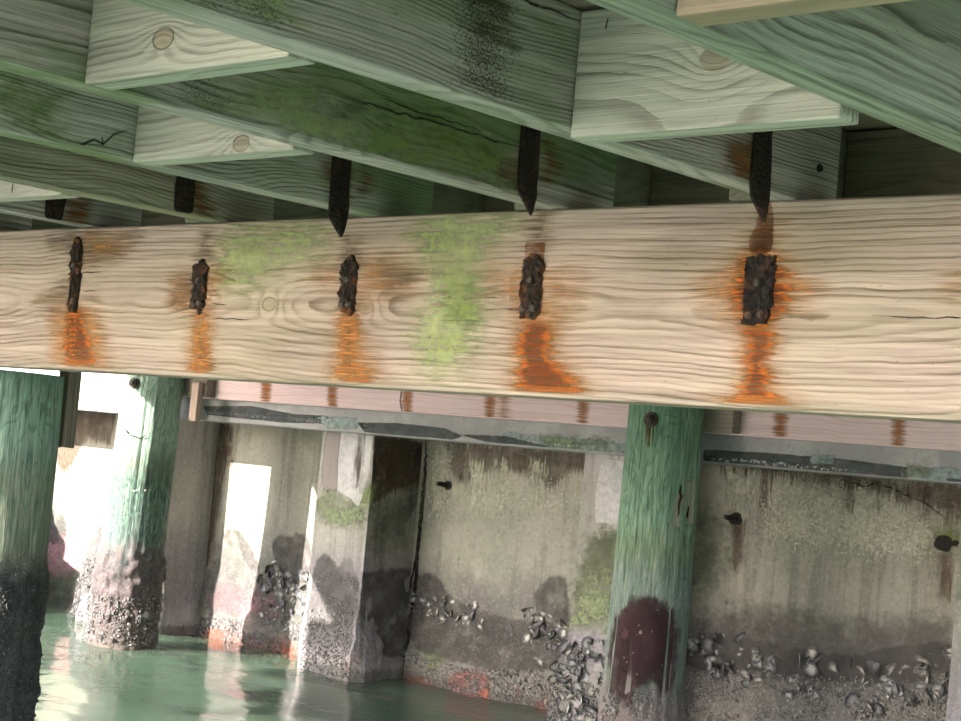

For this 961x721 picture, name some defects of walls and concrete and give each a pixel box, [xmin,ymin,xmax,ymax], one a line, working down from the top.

water stain [449,0,524,101]
crack [525,0,575,20]
crack [80,130,128,145]
crack [304,81,518,147]
corrosion [46,198,137,264]
corrosion [33,283,107,368]
corrosion [171,279,215,373]
corrosion [328,314,379,406]
corrosion [481,212,590,423]
corrosion [699,204,818,436]
peeling [670,477,696,530]
crack [402,440,427,678]